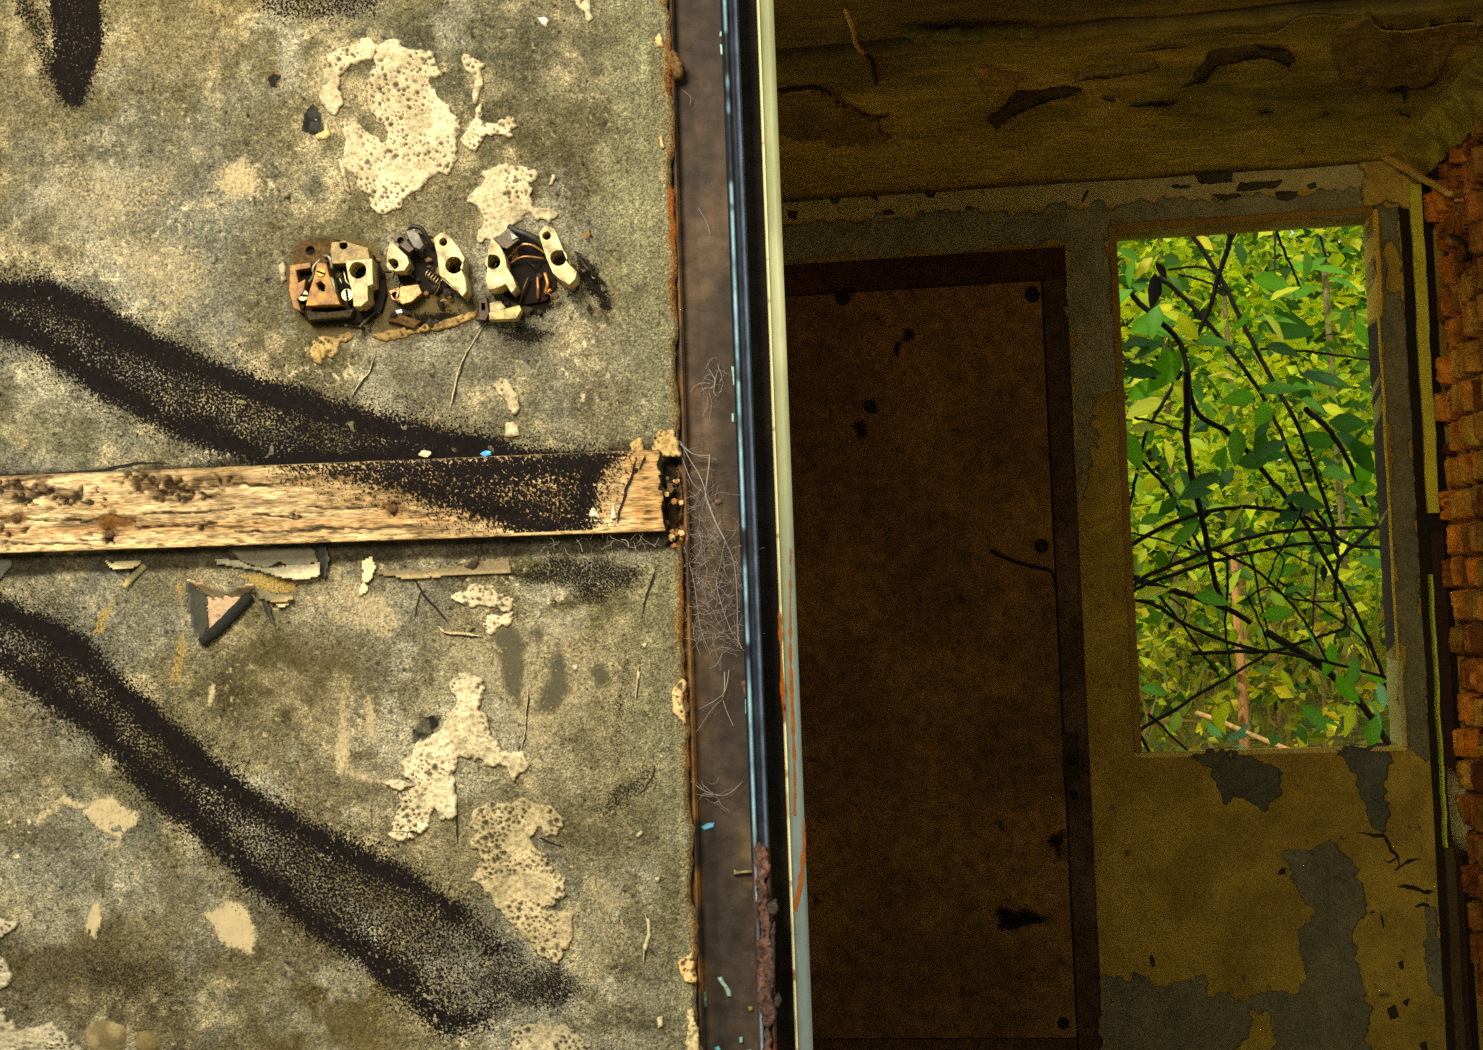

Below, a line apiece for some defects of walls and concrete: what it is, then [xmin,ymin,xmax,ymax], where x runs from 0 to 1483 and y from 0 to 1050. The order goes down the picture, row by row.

peeling [302,37,518,215]
peeling [467,163,558,243]
peeling [381,671,574,964]
corrosion [754,549,806,1050]
peeling [0,917,84,1050]
peeling [508,1020,591,1050]
peeling [642,918,651,951]
peeling [685,1008,700,1050]
peeling [1098,839,1410,1050]
peeling [1423,906,1444,1001]